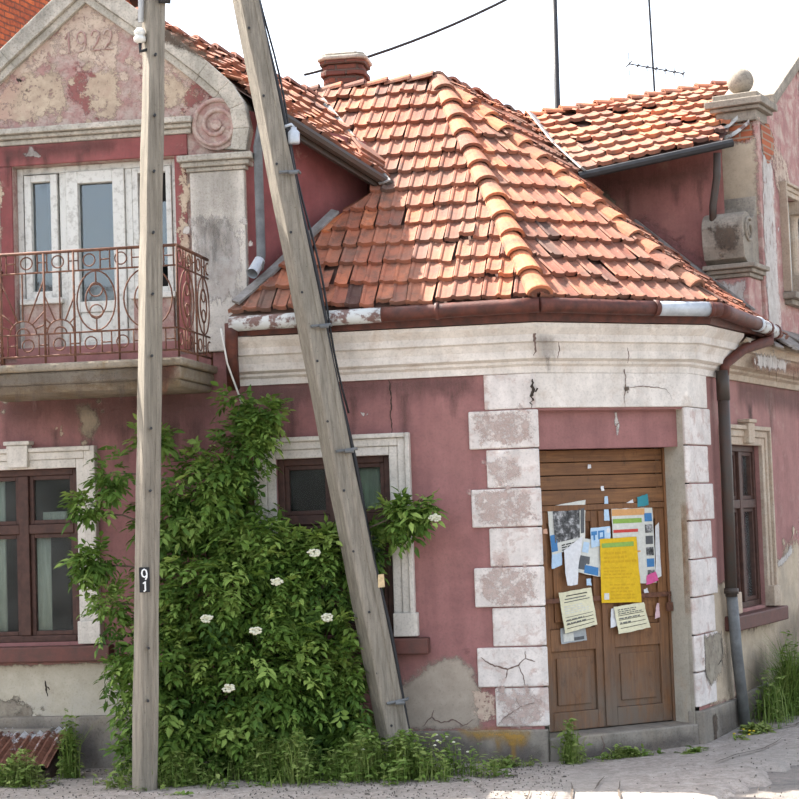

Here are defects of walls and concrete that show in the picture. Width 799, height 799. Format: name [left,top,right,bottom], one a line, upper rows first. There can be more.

peeling [0,4,143,129]
peeling [164,59,212,117]
flaking render [165,29,217,60]
flaking render [718,117,790,326]
crack [529,379,538,408]
crack [624,348,670,402]
flaking render [703,582,736,704]
flaking render [741,527,799,691]
flaking render [0,663,132,716]
crack [424,710,472,726]
flaking render [403,651,542,731]
crack [482,654,535,725]